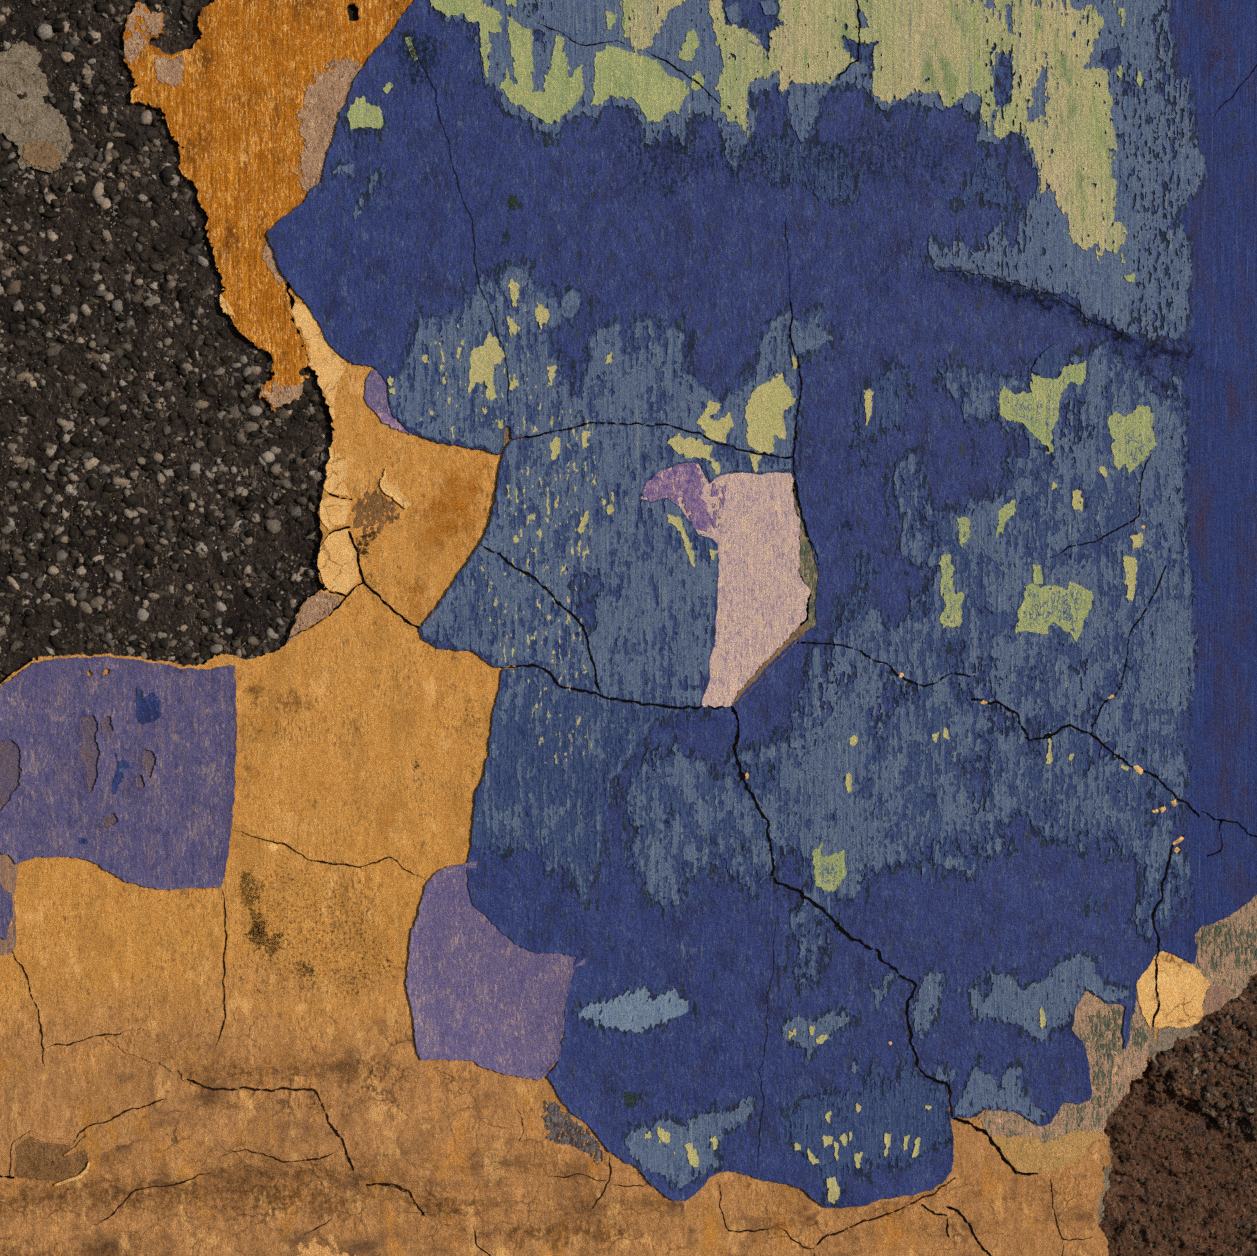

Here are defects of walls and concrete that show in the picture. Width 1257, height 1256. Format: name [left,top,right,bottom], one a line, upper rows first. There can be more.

crack [1214,65,1257,117]
spalling [0,0,436,956]
crack [1045,449,1157,560]
peeling [364,0,1257,1256]
crack [12,952,119,1066]
crack [215,888,228,1048]
crack [234,830,426,880]
crack [481,545,1092,1256]
crack [797,565,1257,1027]
crack [73,1099,164,1144]
crack [94,1079,424,1225]
crack [473,1227,491,1256]